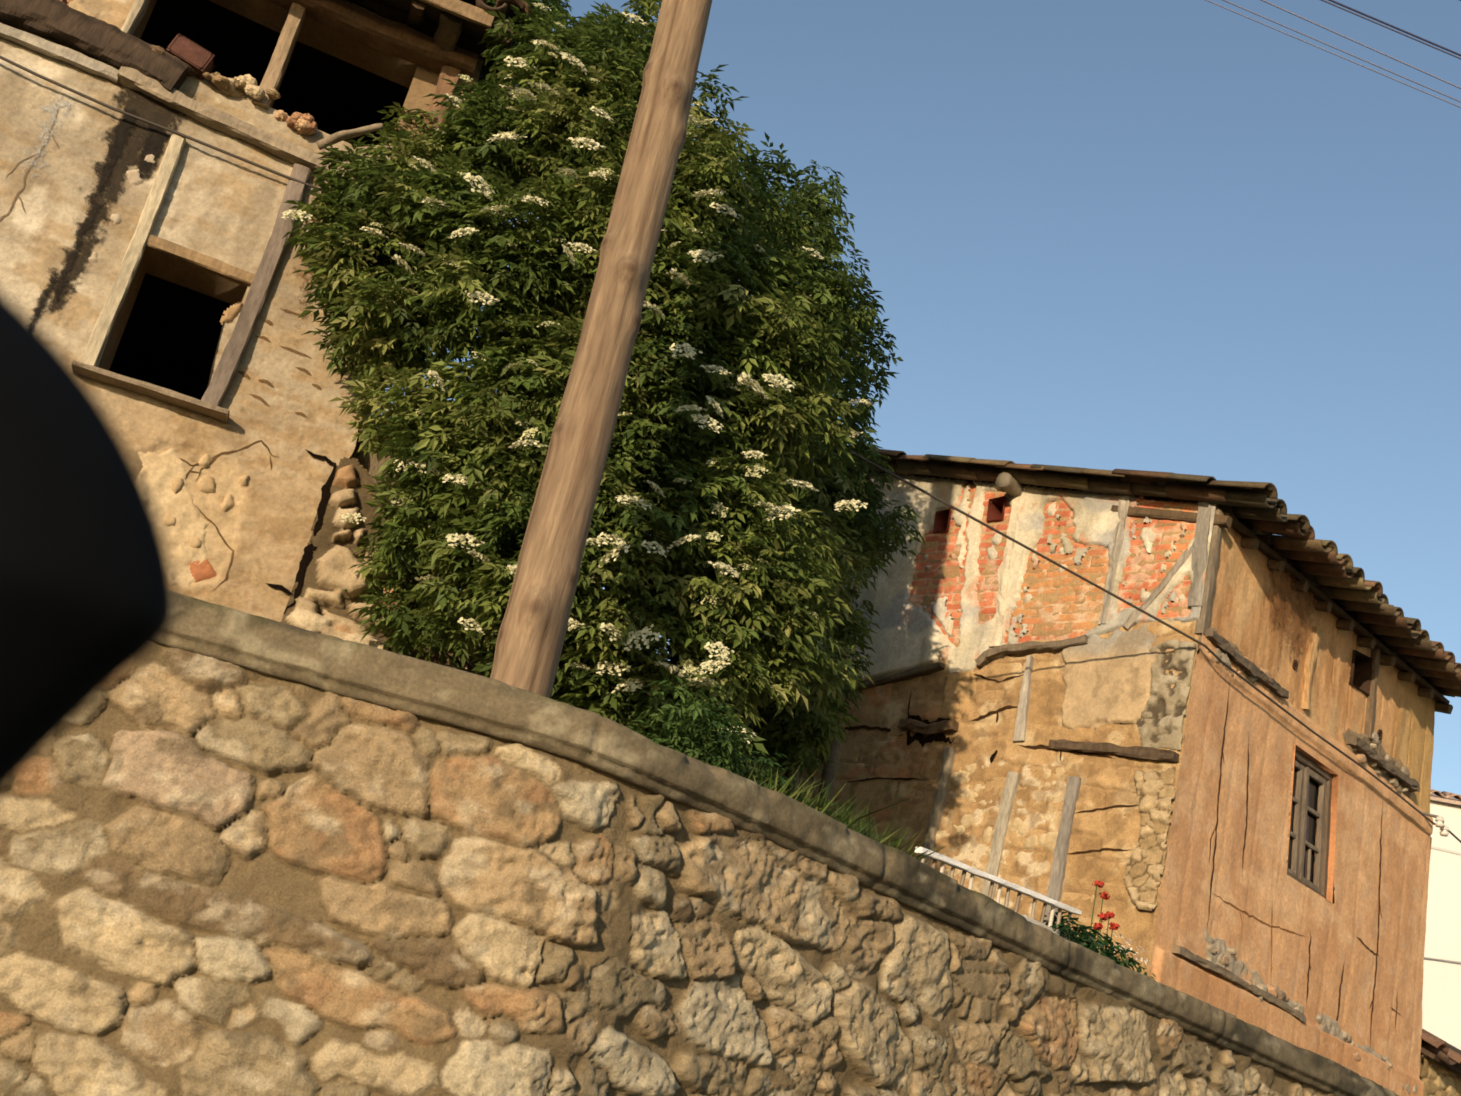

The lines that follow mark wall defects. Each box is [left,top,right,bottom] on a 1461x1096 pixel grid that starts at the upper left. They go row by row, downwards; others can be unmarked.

crack [0,101,59,221]
water stain [30,85,196,324]
crack [180,440,336,613]
flaking render [908,483,1275,911]
crack [1206,685,1400,1047]
spalling [1204,928,1393,1070]